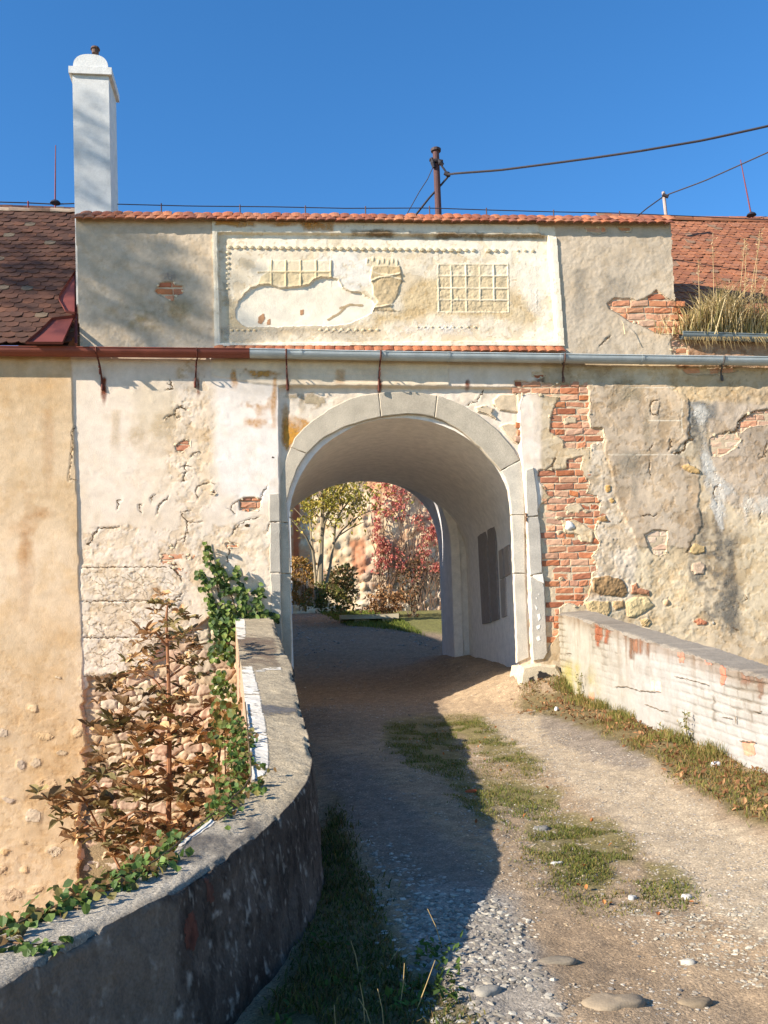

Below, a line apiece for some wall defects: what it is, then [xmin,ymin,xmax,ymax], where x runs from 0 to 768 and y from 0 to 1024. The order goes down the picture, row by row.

flaking render [154,281,184,303]
flaking render [607,289,738,376]
flaking render [174,439,191,453]
leakage [687,402,715,434]
flaking render [709,409,768,458]
flaking render [238,497,261,527]
flaking render [475,371,670,654]
leakage [692,448,739,632]
flaking render [158,544,195,574]